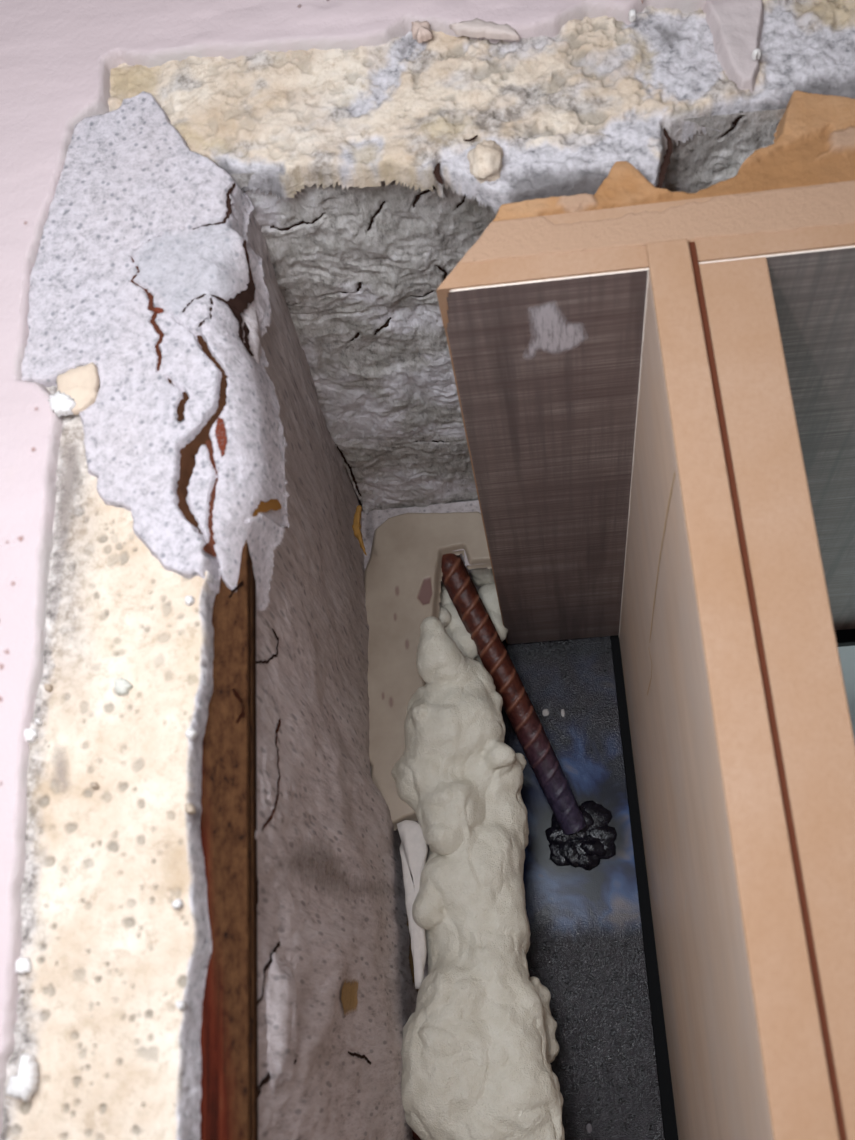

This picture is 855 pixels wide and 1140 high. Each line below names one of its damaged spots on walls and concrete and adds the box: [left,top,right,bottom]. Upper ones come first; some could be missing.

spalling [108,0,855,214]
crack [721,116,742,137]
crack [656,127,673,188]
crack [413,163,467,210]
crack [367,201,385,231]
crack [411,265,447,297]
crack [351,317,391,341]
crack [131,183,323,557]
crack [335,444,361,496]
spalling [0,91,289,1140]